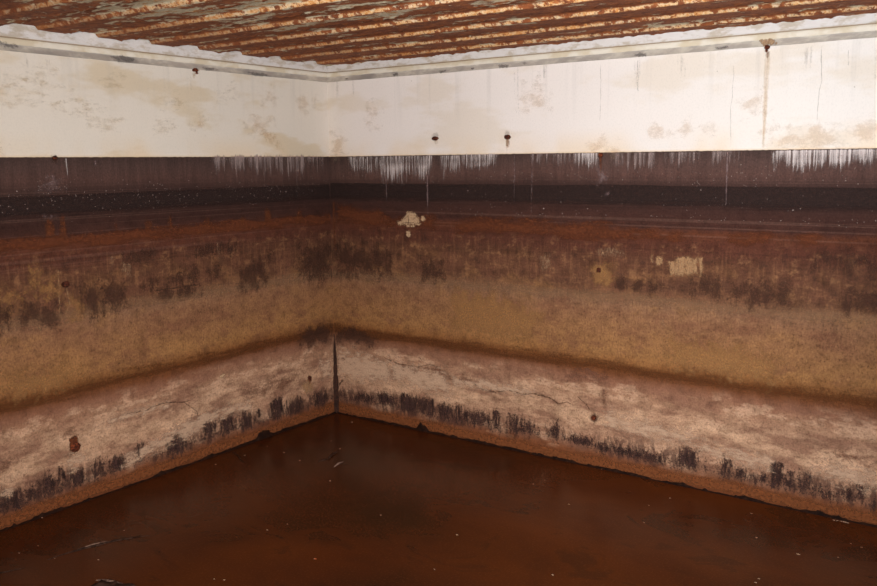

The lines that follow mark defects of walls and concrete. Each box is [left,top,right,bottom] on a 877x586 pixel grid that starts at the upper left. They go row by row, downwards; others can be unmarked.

water stain [0,153,877,217]
water stain [773,149,877,169]
peeling [397,211,426,237]
peeling [651,255,703,277]
water stain [0,377,877,512]
rust [0,402,877,528]